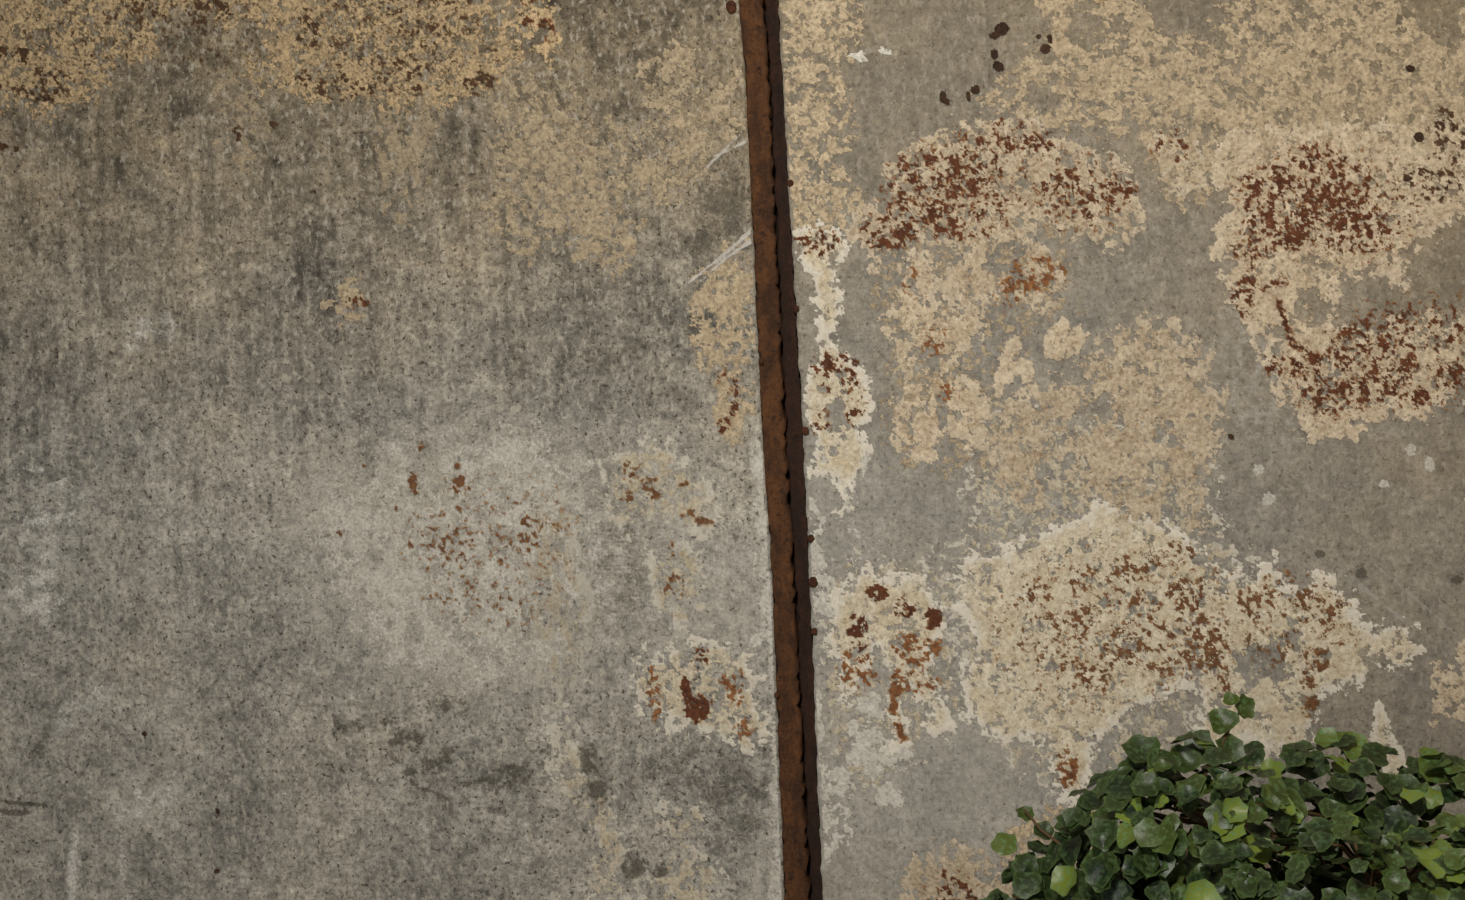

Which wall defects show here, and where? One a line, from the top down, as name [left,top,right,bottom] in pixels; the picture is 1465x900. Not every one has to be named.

peeling [0,0,746,286]
rust [921,320,947,357]
rust [929,380,959,402]
rust [793,113,1139,295]
rust [992,255,1069,316]
peeling [780,0,1465,900]
rust [1149,127,1189,167]
rust [1226,101,1465,421]
peeling [596,425,776,756]
rust [646,644,755,741]
rust [835,584,945,744]
rust [969,537,1365,722]